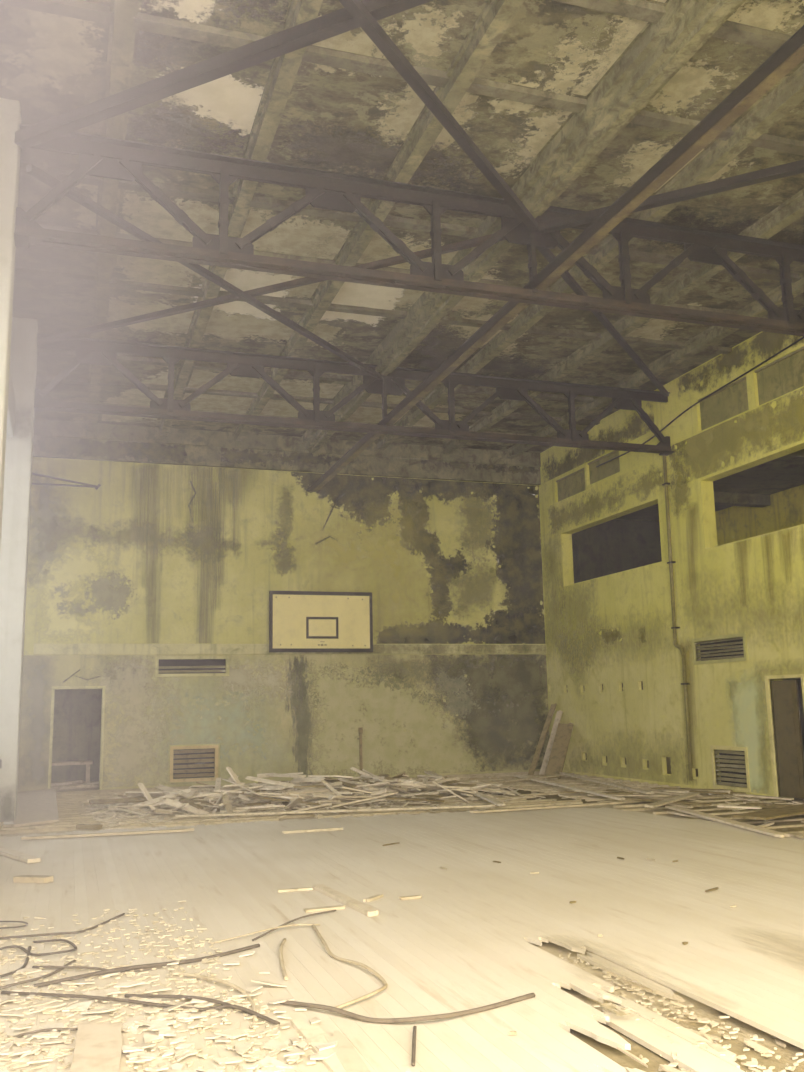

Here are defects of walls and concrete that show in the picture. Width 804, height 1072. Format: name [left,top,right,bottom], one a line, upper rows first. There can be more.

peeling [139,0,223,24]
peeling [312,27,387,60]
peeling [381,1,464,68]
peeling [161,74,264,137]
damp [14,409,354,643]
damp [362,405,654,771]
damp [286,655,313,775]